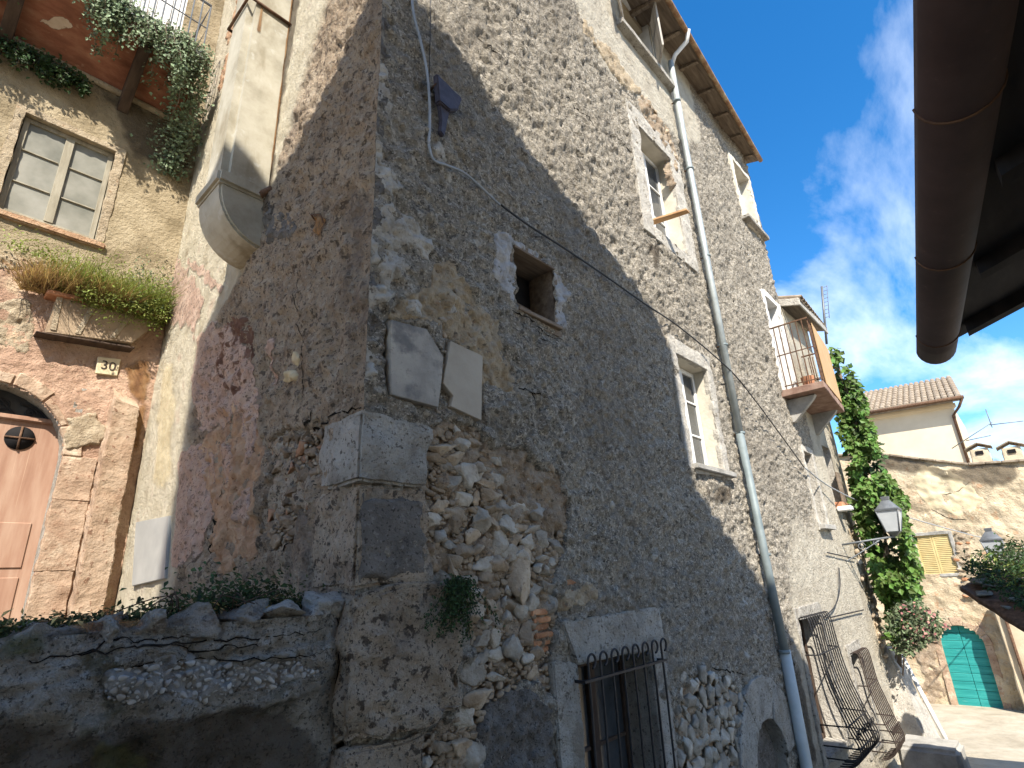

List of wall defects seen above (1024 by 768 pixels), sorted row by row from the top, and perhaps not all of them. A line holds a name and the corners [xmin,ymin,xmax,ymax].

flaking render [365,0,515,392]
crack [29,617,340,684]